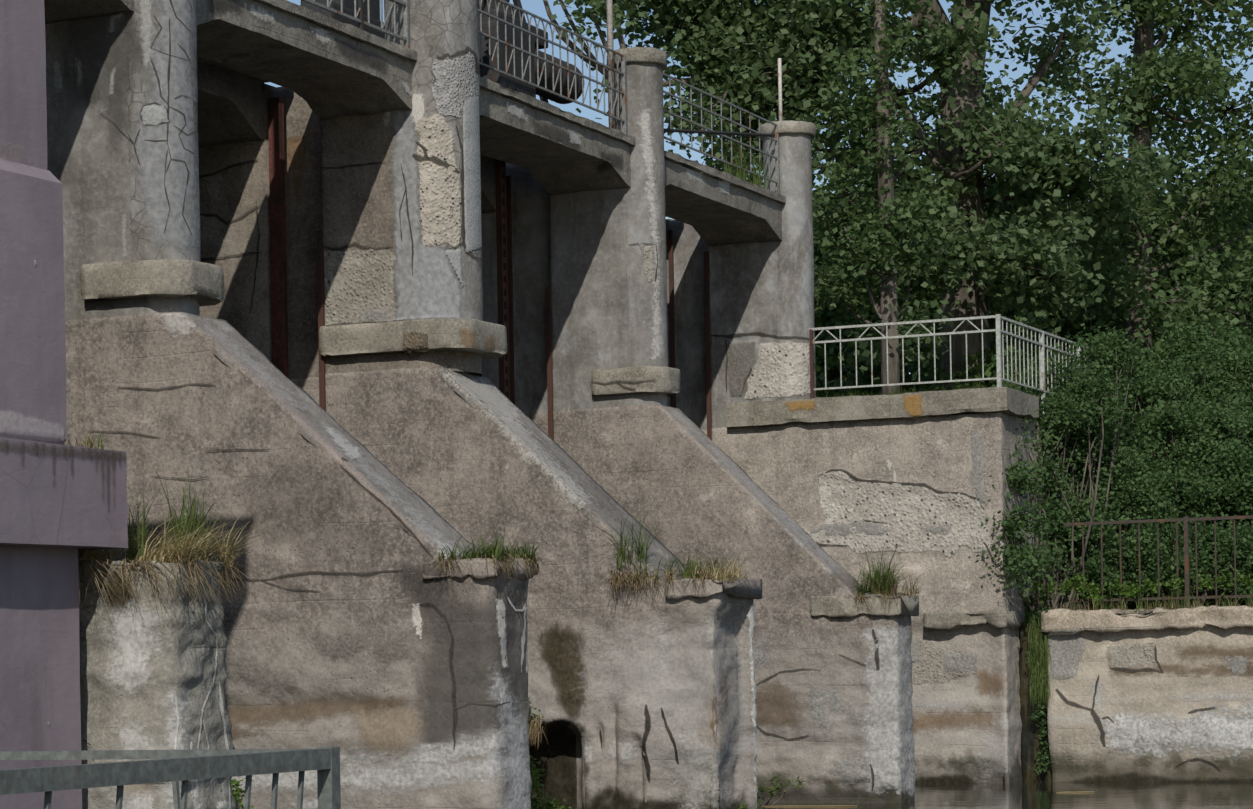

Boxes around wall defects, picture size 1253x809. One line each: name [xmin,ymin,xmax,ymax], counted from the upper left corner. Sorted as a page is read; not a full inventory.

crack [101,0,262,313]
spalling [415,51,482,286]
peeling [0,410,64,442]
spalling [728,341,811,399]
spalling [808,432,992,557]
damp [105,571,160,694]
damp [167,598,229,750]
damp [217,770,318,809]
damp [340,597,687,809]
crack [641,705,679,781]
crack [1055,646,1164,746]
crack [1188,706,1216,714]